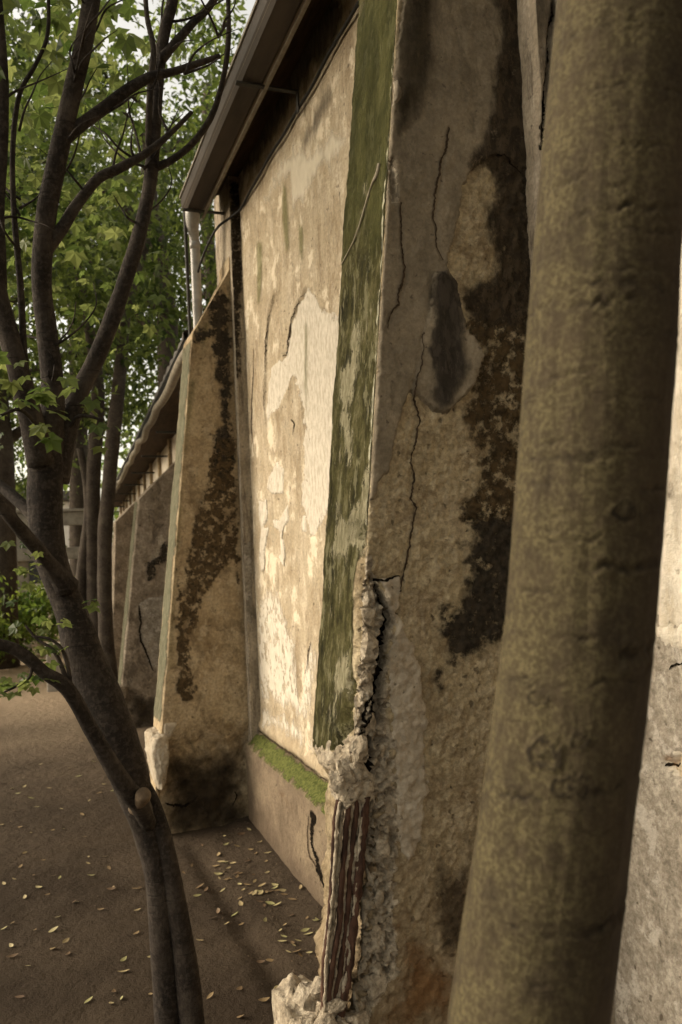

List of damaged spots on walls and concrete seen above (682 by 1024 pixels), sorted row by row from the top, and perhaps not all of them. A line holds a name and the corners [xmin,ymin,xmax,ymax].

damp [398,0,431,132]
crack [540,7,554,148]
crack [432,127,450,259]
crack [387,202,406,328]
damp [146,0,344,702]
damp [429,0,530,690]
peeling [243,287,339,626]
crack [307,810,324,888]
spalling [313,549,429,1021]